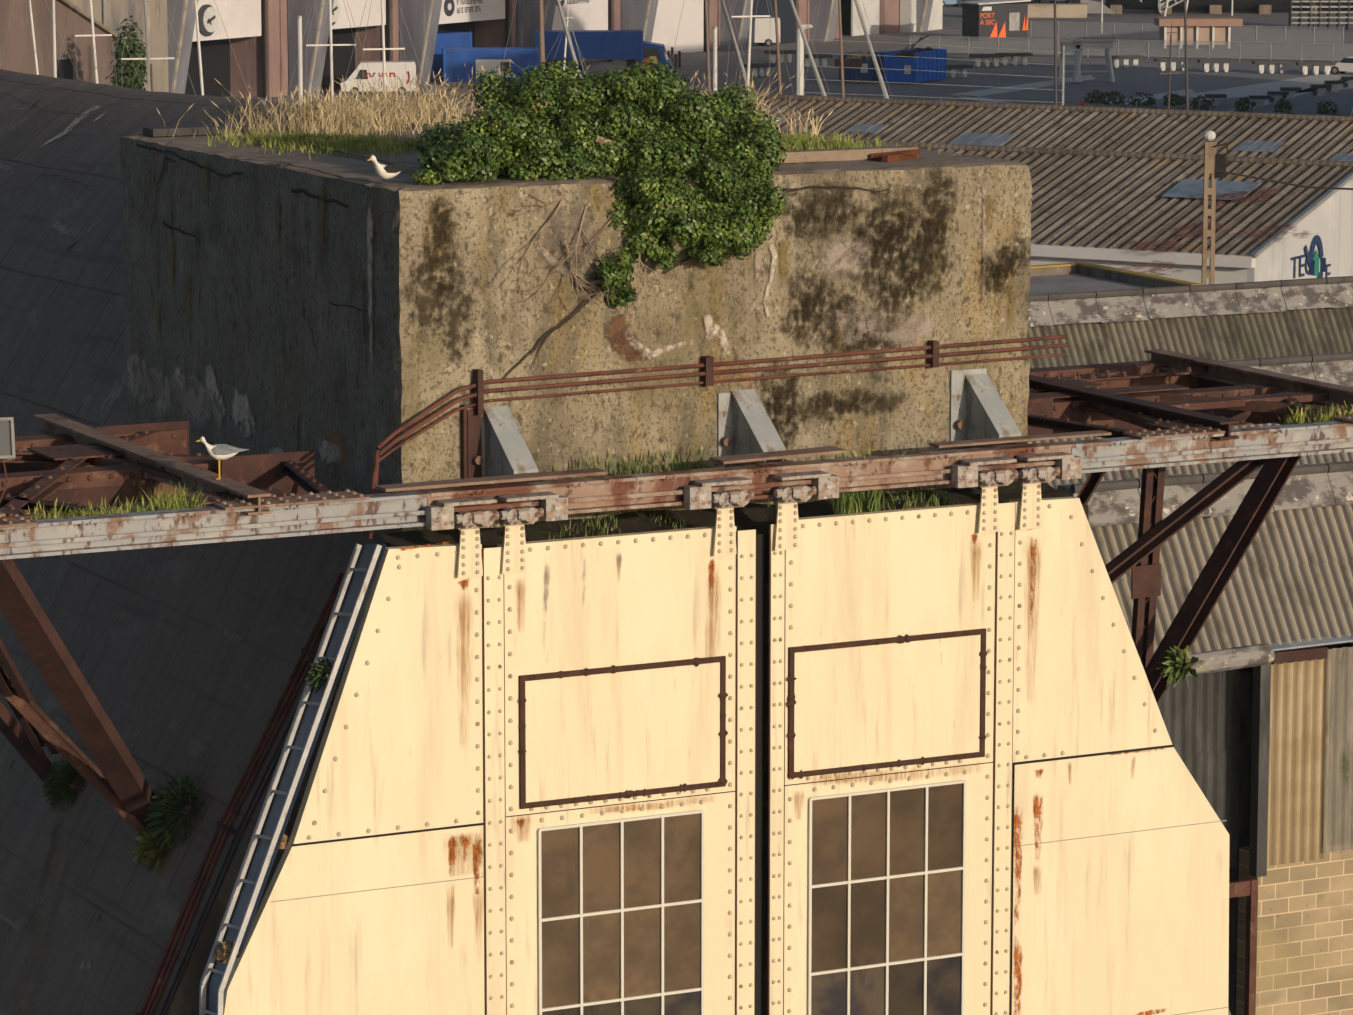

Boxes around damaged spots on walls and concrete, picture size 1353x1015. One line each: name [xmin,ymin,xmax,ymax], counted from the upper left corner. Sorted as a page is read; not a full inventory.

water stain [755,241,788,316]
water stain [824,238,868,274]
efflorescence [704,315,728,351]
water stain [834,306,934,345]
corrosion [459,580,469,670]
corrosion [709,560,717,642]
corrosion [449,836,483,894]
corrosion [1014,796,1042,918]
corrosion [1014,947,1022,1012]